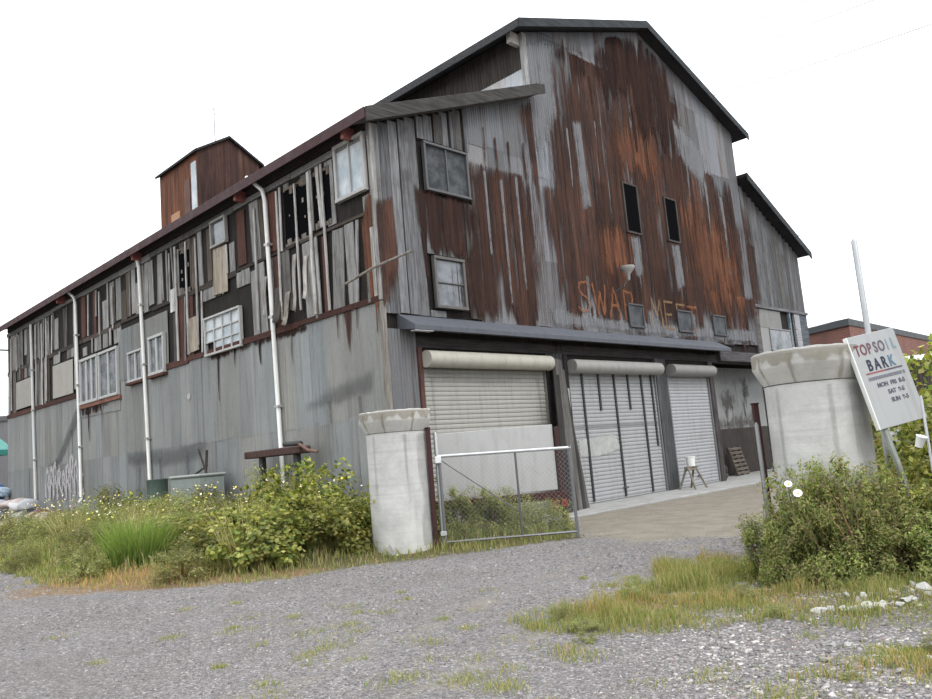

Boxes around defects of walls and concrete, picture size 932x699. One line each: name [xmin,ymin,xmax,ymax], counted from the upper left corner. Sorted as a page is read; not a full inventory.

corrosion [414,36,760,354]